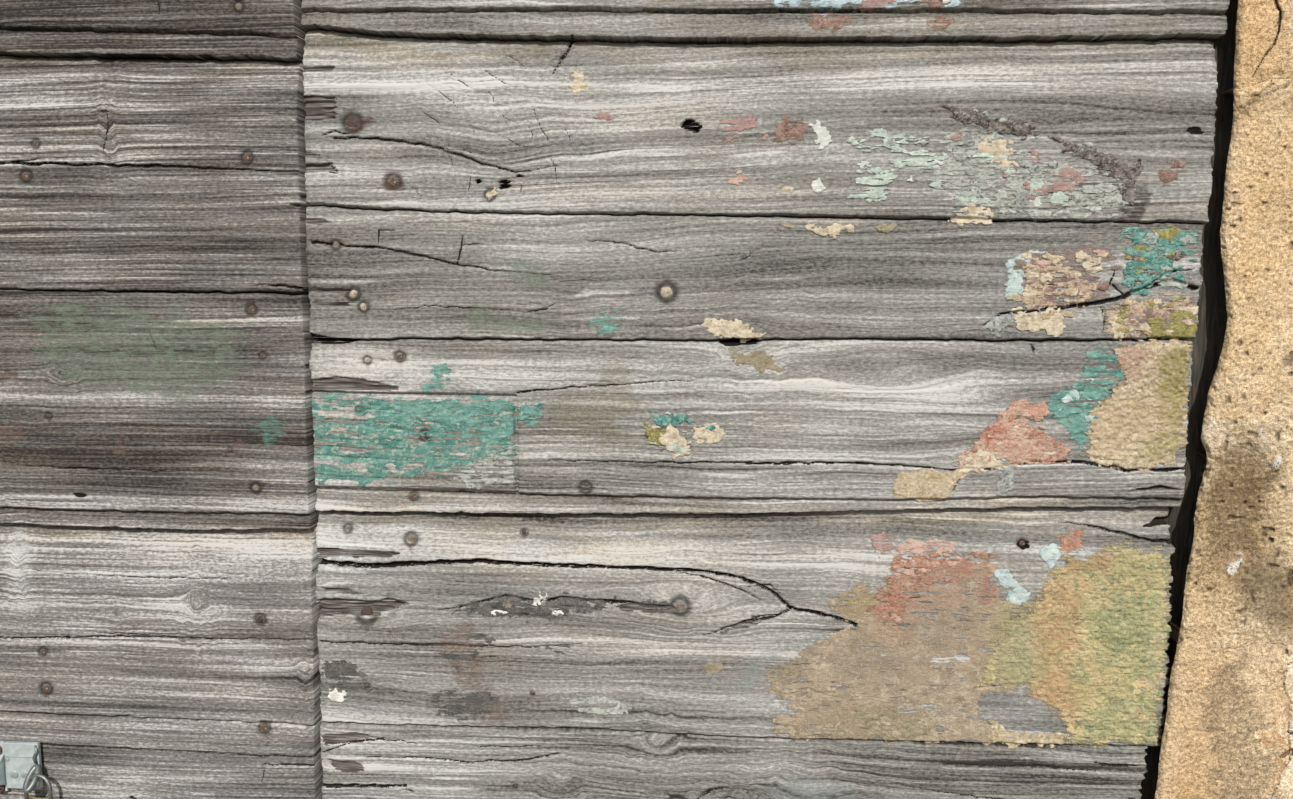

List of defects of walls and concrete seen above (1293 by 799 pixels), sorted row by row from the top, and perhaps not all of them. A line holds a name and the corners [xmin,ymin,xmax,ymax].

peeling [773,0,962,32]
crack [1252,0,1282,77]
peeling [593,111,616,121]
peeling [718,104,1200,502]
peeling [701,318,783,373]
peeling [304,362,544,490]
peeling [643,411,726,460]
crack [0,558,857,658]
peeling [765,529,1172,749]
crack [40,738,560,793]
crack [666,787,732,799]
crack [1279,731,1293,758]